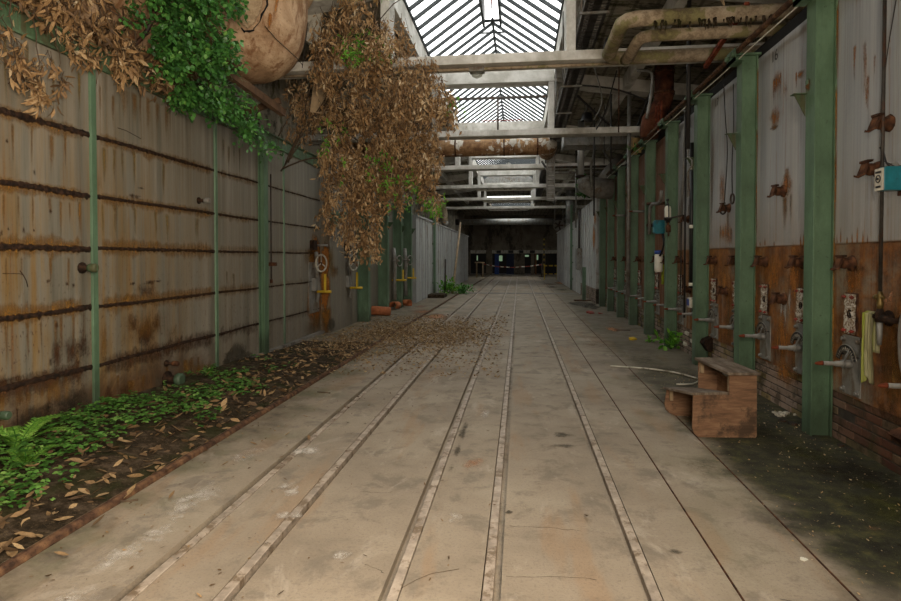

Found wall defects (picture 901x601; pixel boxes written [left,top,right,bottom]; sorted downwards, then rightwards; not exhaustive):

rust [0,107,321,201]
rust [0,179,336,424]
rust [832,89,868,352]
rust [888,334,901,390]